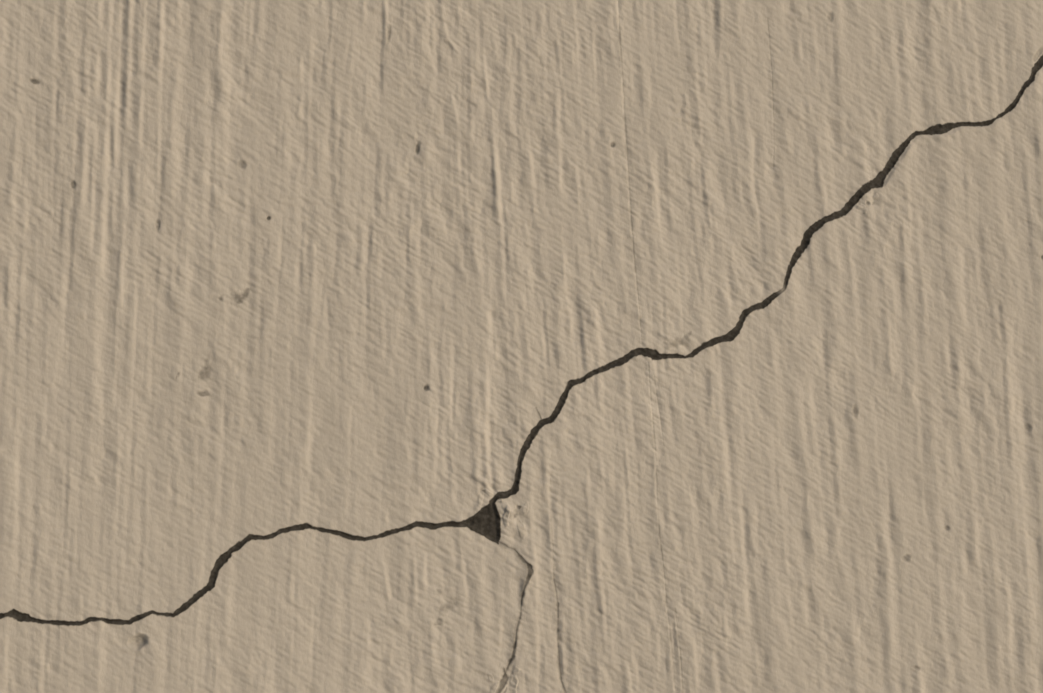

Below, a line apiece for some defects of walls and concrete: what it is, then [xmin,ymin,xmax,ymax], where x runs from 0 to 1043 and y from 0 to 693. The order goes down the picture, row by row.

crack [0,519,464,627]
crack [488,52,1043,693]